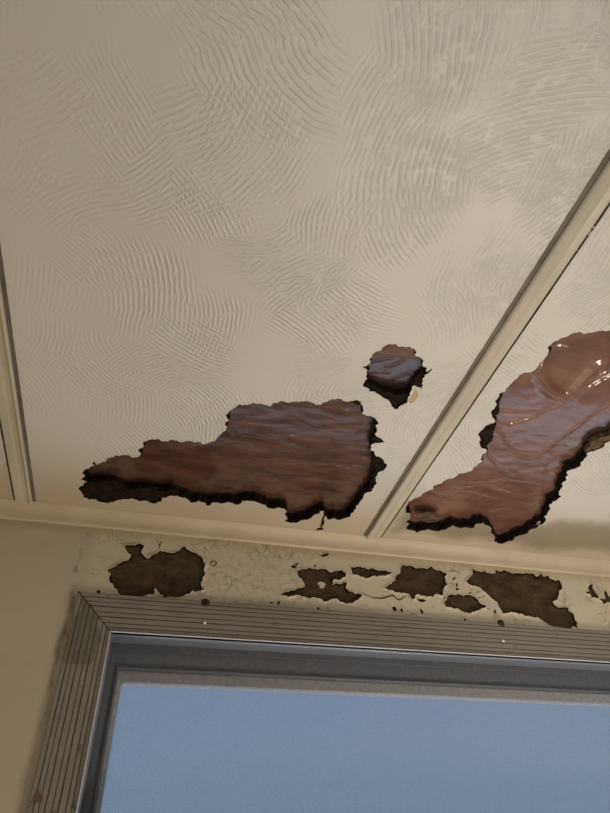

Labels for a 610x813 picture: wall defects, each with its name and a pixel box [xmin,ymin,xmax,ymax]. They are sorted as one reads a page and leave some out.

peeling [365,366,425,407]
peeling [367,432,386,491]
peeling [480,393,503,448]
peeling [584,428,610,453]
peeling [81,477,178,502]
peeling [417,511,442,522]
peeling [104,541,208,599]
peeling [270,553,580,629]
peeling [583,582,610,625]